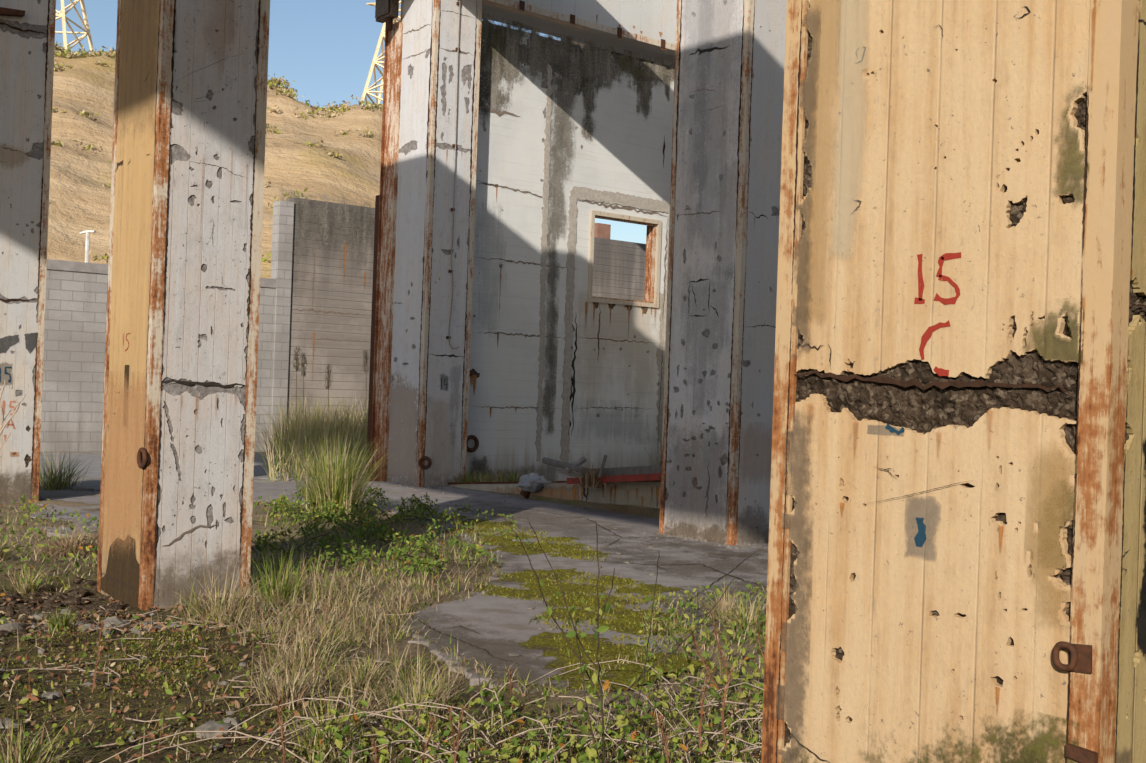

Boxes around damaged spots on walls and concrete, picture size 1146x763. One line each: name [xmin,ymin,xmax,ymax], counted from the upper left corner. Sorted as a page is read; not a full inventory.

spalling [1074,95,1087,133]
leakage [479,12,675,433]
spalling [1004,186,1027,226]
crack [101,0,261,592]
spalling [201,264,250,360]
crack [290,231,371,343]
spalling [1128,281,1146,326]
peeling [11,366,35,407]
spalling [161,364,246,481]
spalling [796,317,1079,454]
peeling [156,485,242,548]
leakage [100,534,140,607]